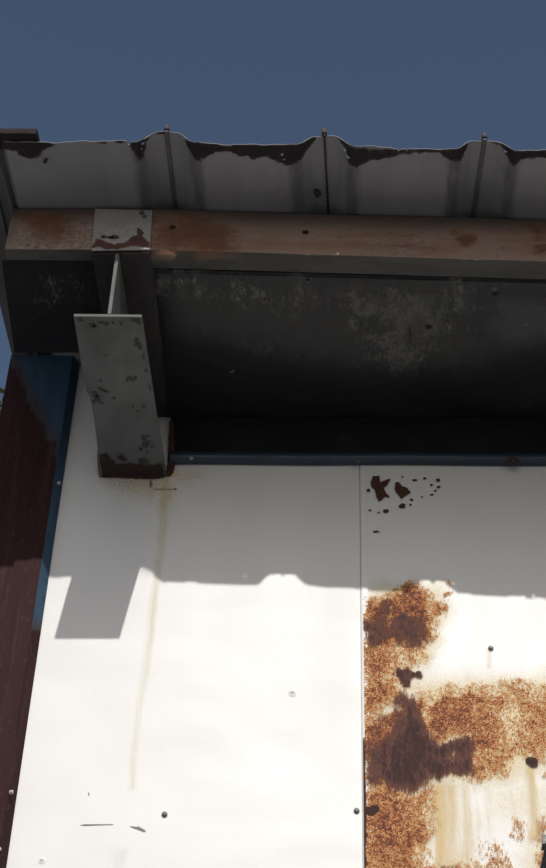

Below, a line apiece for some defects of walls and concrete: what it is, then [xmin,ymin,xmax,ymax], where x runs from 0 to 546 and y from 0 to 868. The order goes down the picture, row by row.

rust [1,141,55,164]
rust [185,137,316,166]
rust [338,138,469,168]
rust [492,142,546,165]
rust [91,228,150,249]
rust [99,420,175,479]
rust [363,580,546,868]